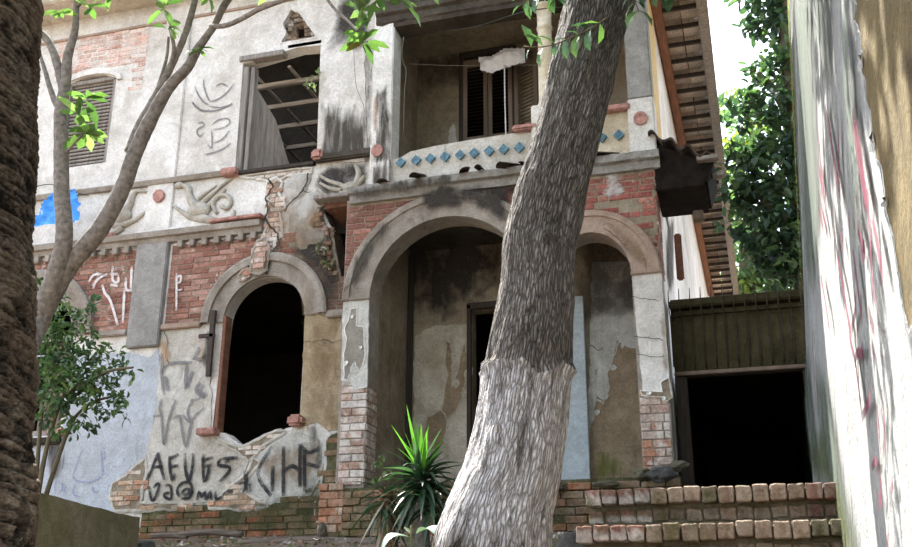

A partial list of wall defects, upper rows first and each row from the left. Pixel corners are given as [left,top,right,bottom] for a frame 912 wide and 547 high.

water stain [318,86,516,218]
flaking render [237,167,312,282]
water stain [411,243,501,319]
flaking render [207,429,286,512]
flaking render [300,307,366,522]
flaking render [588,261,673,479]